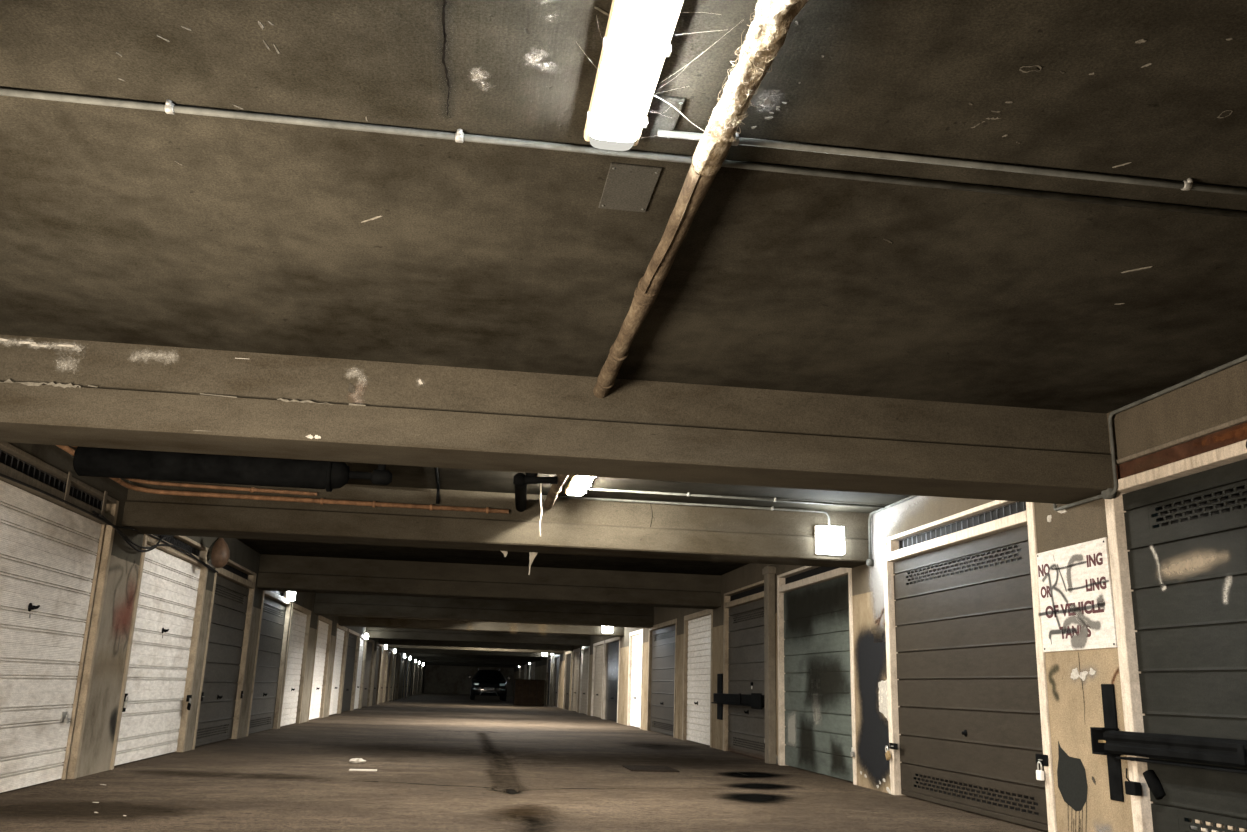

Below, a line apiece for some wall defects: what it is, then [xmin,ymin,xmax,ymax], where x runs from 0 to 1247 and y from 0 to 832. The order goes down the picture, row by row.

crack [441,0,450,116]